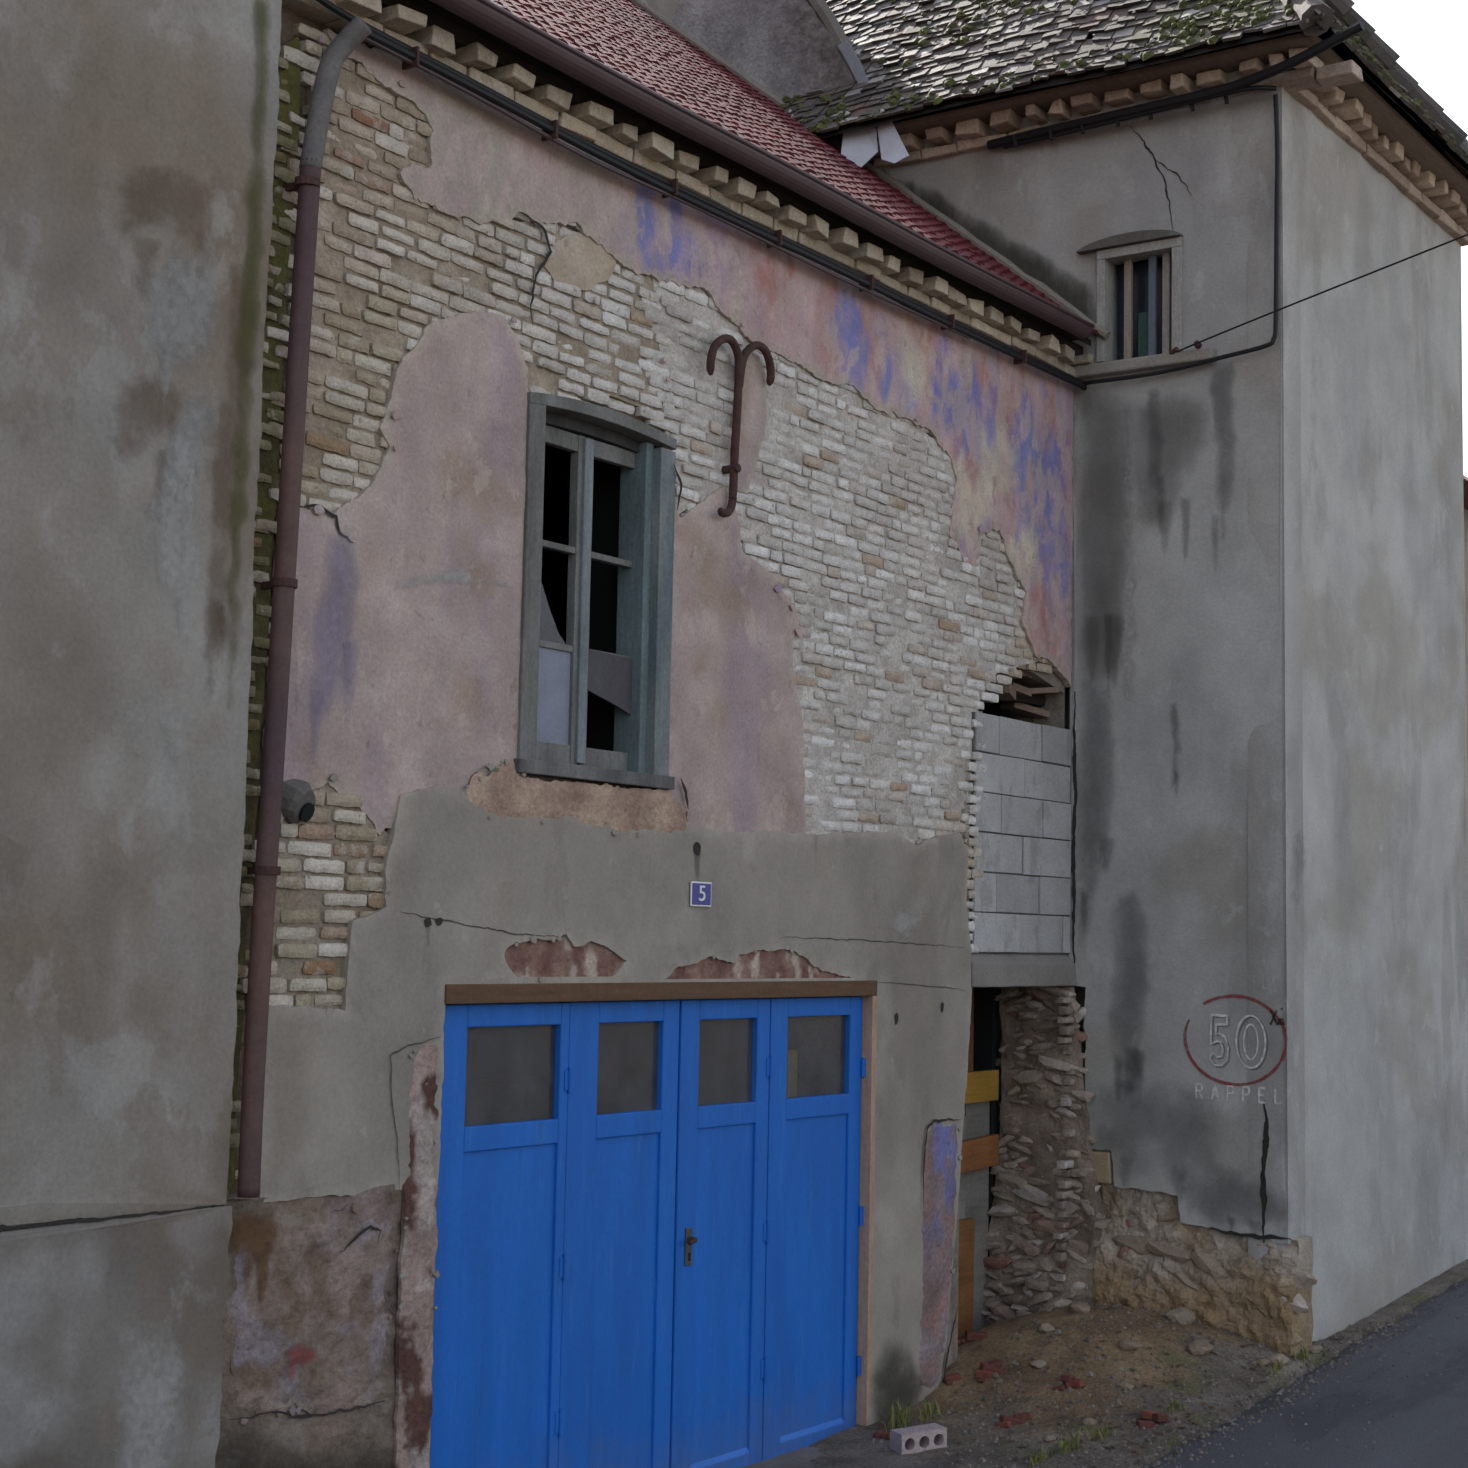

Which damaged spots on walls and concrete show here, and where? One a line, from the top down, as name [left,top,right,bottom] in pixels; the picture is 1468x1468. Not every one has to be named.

crack [1127,125,1192,228]
flaking render [227,23,330,1196]
flaking render [300,59,1060,954]
flaking render [269,773,392,1016]
flaking render [504,935,625,983]
flaking render [666,947,850,979]
flaking render [229,1041,440,1468]
crack [1212,1104,1290,1243]